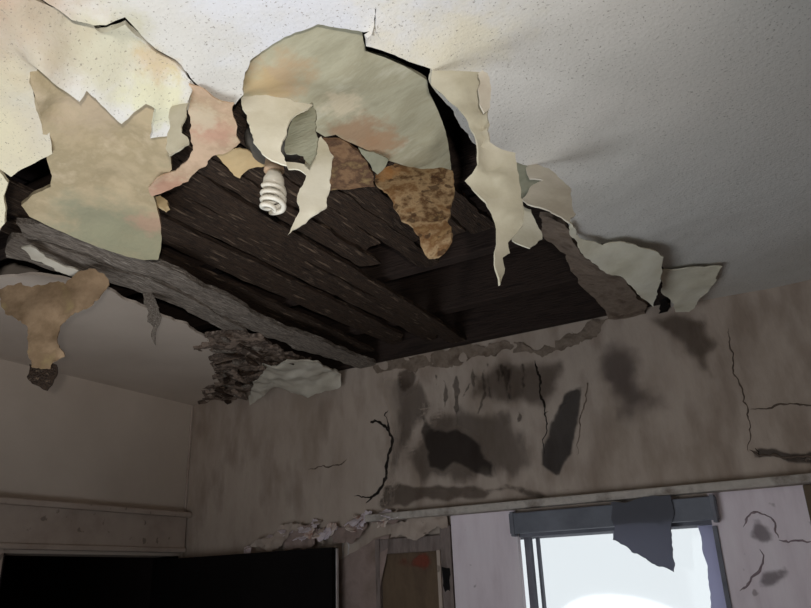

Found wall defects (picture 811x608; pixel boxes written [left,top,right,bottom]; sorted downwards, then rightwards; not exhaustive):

peeling [166,97,192,156]
peeling [241,95,334,235]
corrosion [375,163,455,259]
peeling [373,70,722,374]
flaking render [248,359,341,405]
crack [728,329,811,460]
crack [356,411,394,503]
damp [422,424,491,474]
damp [756,449,811,462]
peeling [244,509,448,553]